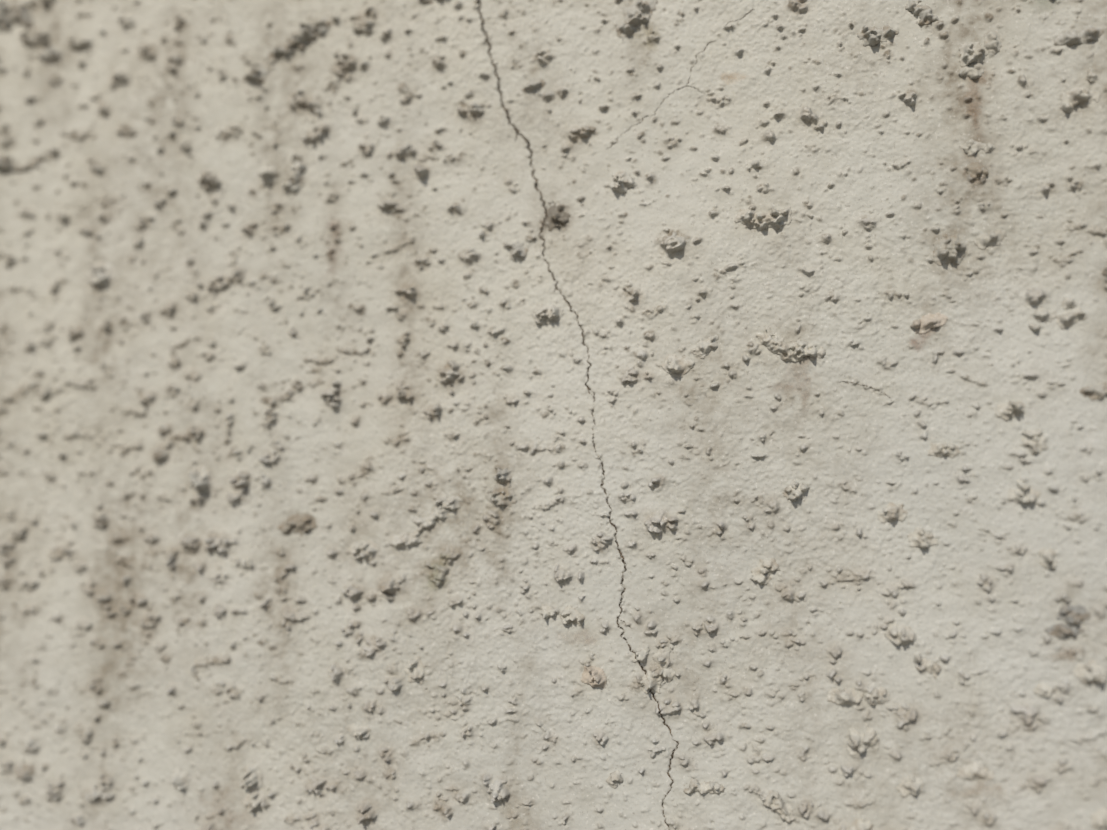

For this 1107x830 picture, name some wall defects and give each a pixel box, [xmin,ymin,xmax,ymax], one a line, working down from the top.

crack [477,0,679,828]
crack [607,9,755,149]